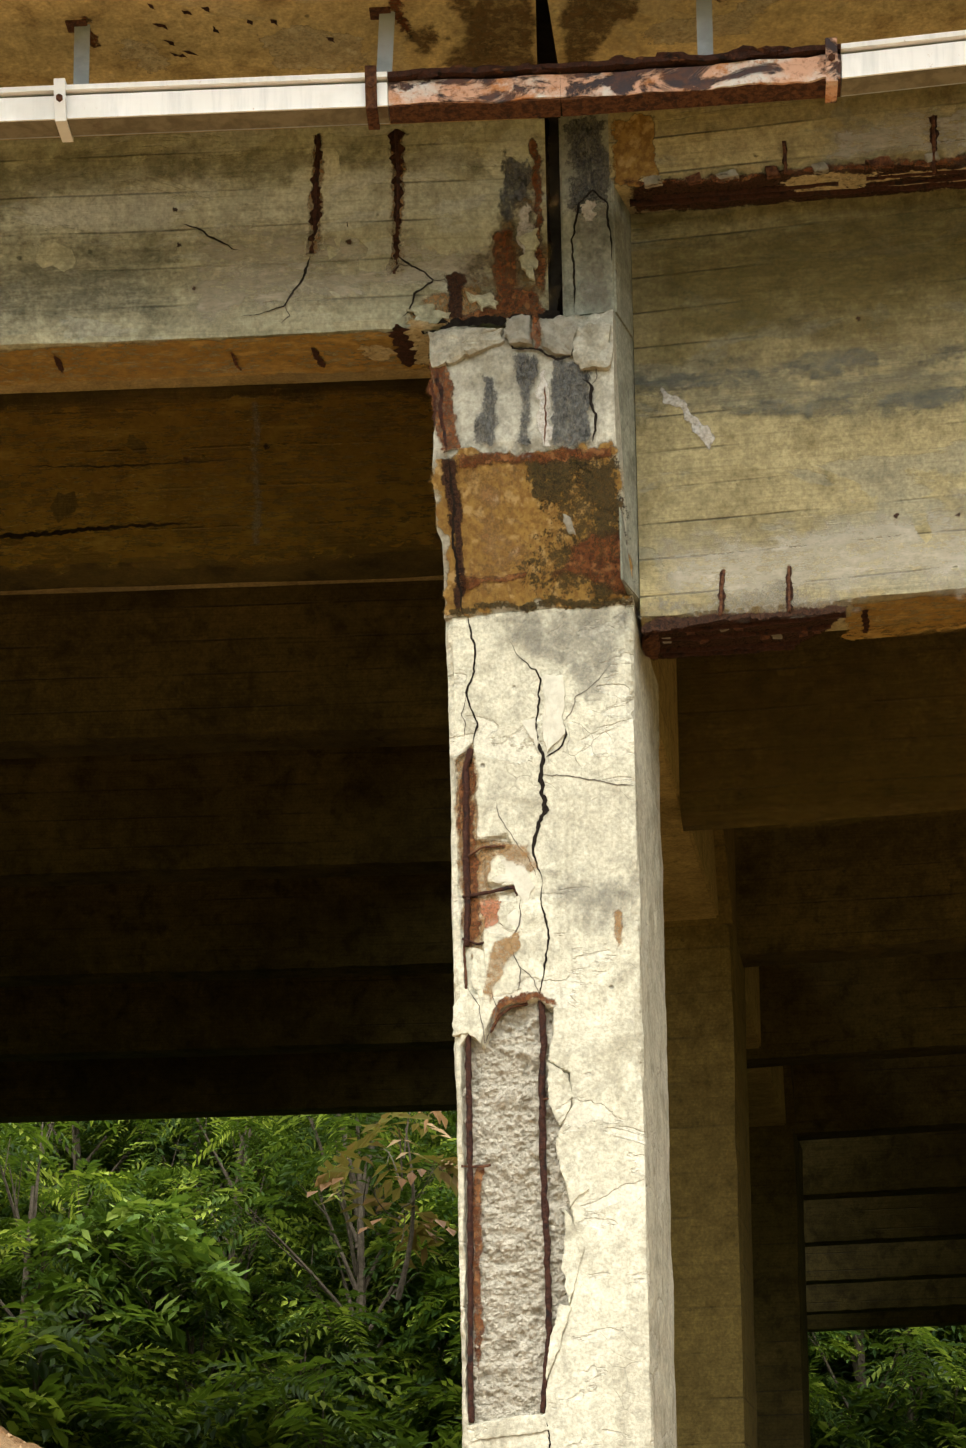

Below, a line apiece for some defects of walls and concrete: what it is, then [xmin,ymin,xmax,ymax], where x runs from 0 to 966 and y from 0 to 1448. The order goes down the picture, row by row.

water stain [407,0,537,68]
water stain [559,0,638,63]
spalling [386,129,406,274]
spalling [624,115,966,214]
crack [244,257,310,322]
spalling [357,189,614,371]
rust [0,138,635,617]
water stain [473,375,499,446]
water stain [513,352,592,447]
crack [461,618,478,741]
crack [495,643,634,993]
spalling [452,746,589,1442]